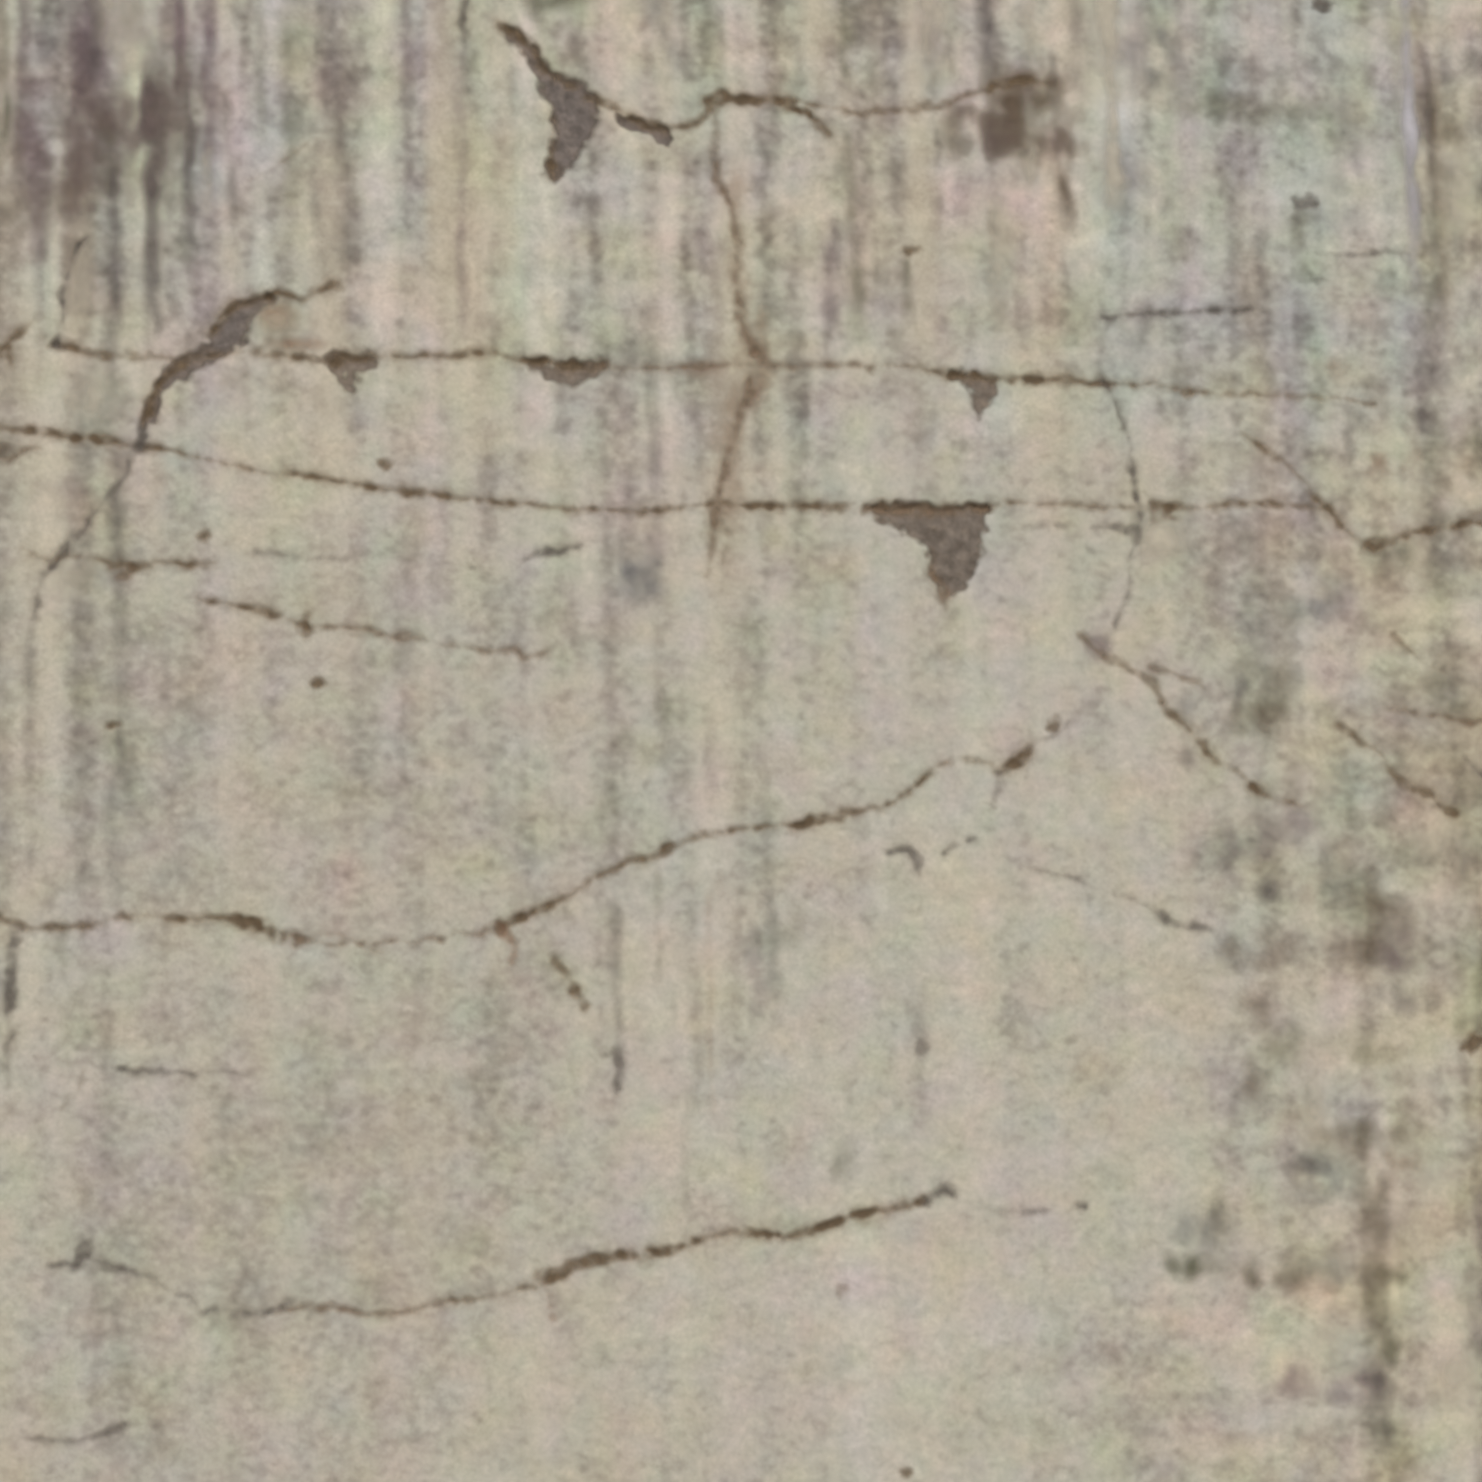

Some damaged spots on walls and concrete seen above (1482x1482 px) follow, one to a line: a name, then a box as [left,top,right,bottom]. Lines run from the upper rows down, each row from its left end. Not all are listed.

leakage [176,1,185,54]
spalling [498,23,598,182]
spalling [616,114,673,146]
crack [586,89,831,135]
leakage [988,96,1023,149]
leakage [1402,88,1418,165]
leakage [142,81,161,290]
spalling [528,357,608,386]
spalling [864,500,990,601]
crack [598,773,930,876]
crack [749,1187,954,1239]
crack [520,1238,702,1289]